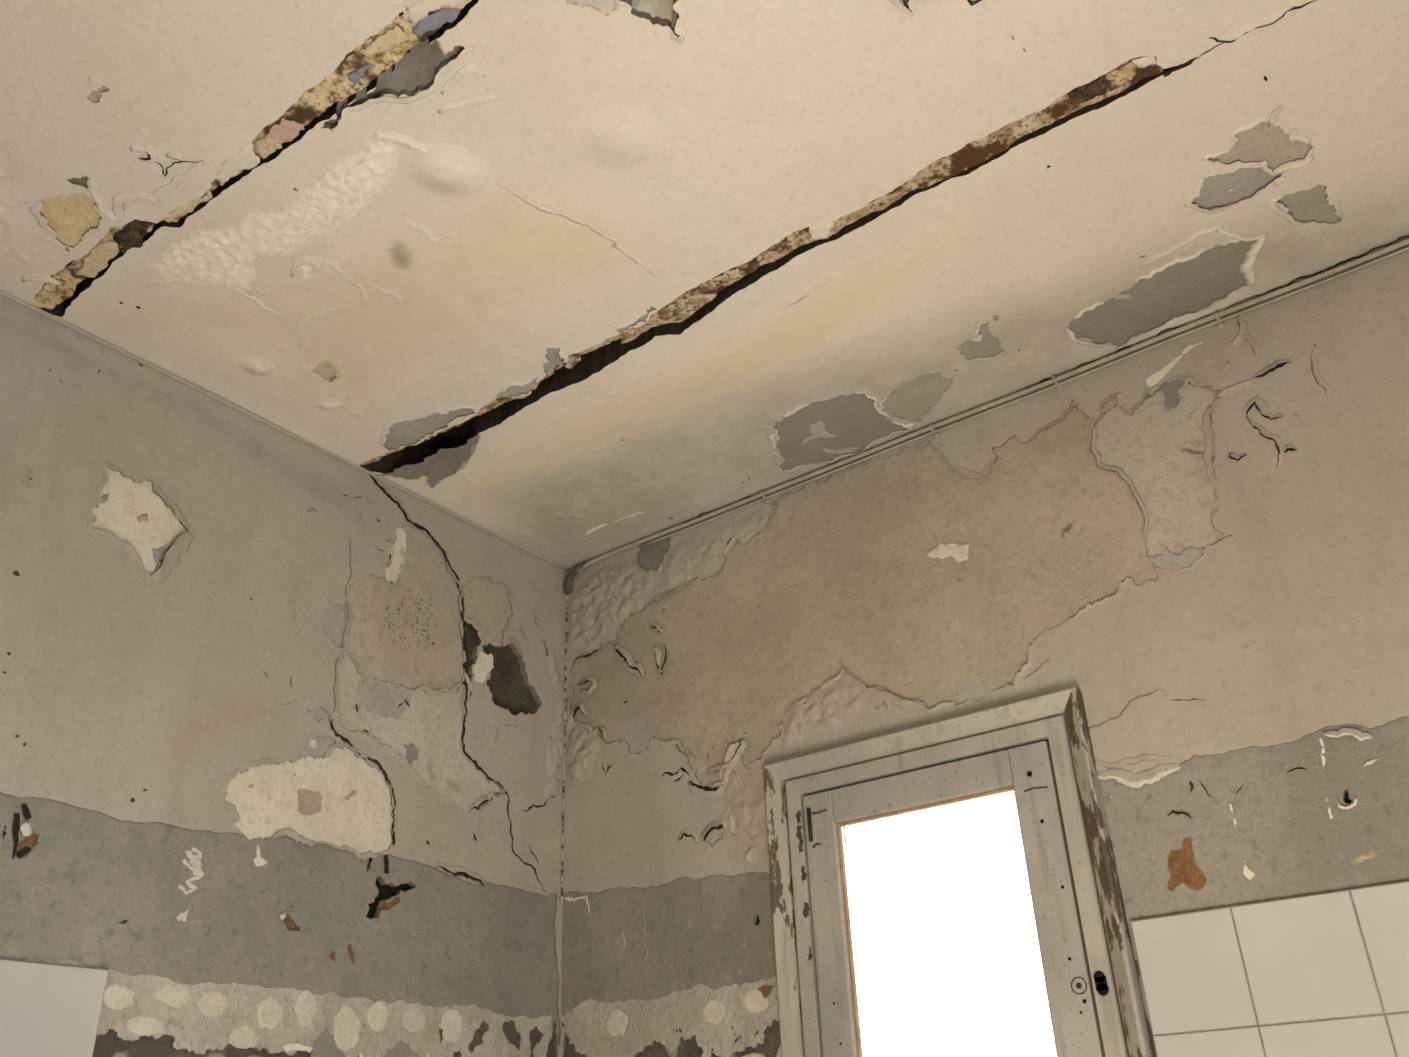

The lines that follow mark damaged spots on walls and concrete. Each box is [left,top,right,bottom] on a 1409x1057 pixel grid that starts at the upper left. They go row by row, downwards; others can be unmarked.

crack [399,0,416,24]
spalling [566,0,688,45]
crack [89,143,204,222]
crack [497,183,654,275]
peeling [1064,233,1268,349]
crack [1139,222,1243,268]
peeling [1184,105,1344,226]
peeling [87,462,193,585]
peeling [566,315,1226,790]
peeling [296,522,537,833]
crack [307,475,564,892]
corrosion [1167,838,1207,892]